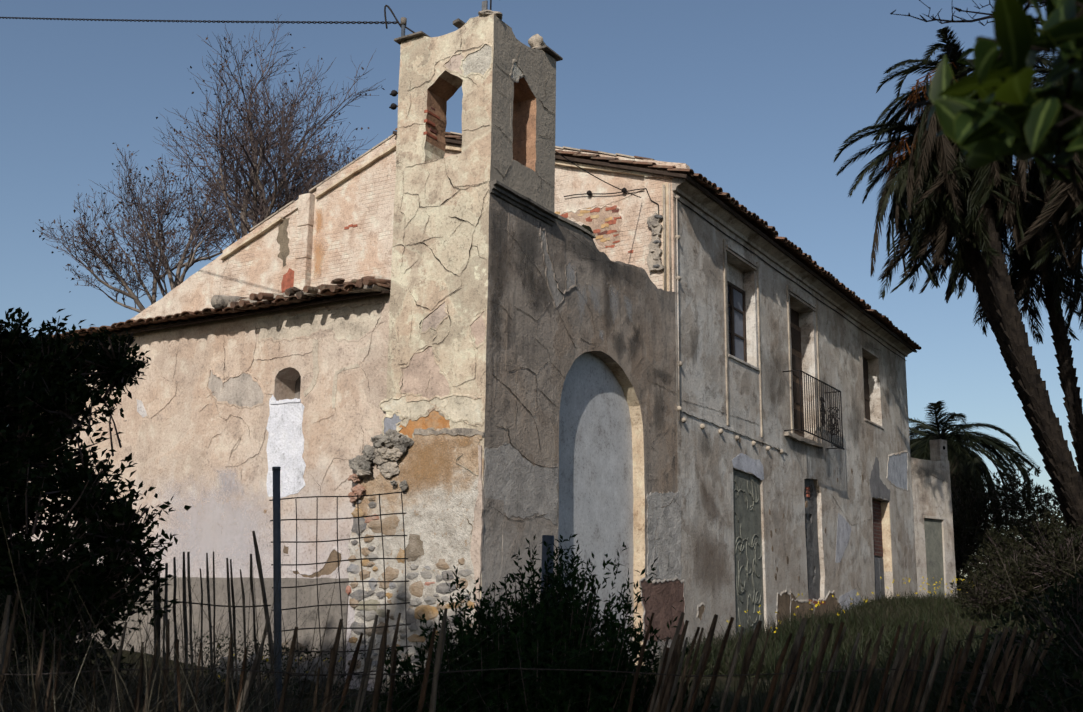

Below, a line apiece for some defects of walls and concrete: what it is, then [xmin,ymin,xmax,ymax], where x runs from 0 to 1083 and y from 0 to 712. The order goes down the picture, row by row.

crack [361,31,595,544]
spalling [555,204,634,253]
spalling [646,212,664,272]
crack [200,319,314,482]
crack [312,428,364,494]
spalling [282,299,558,681]